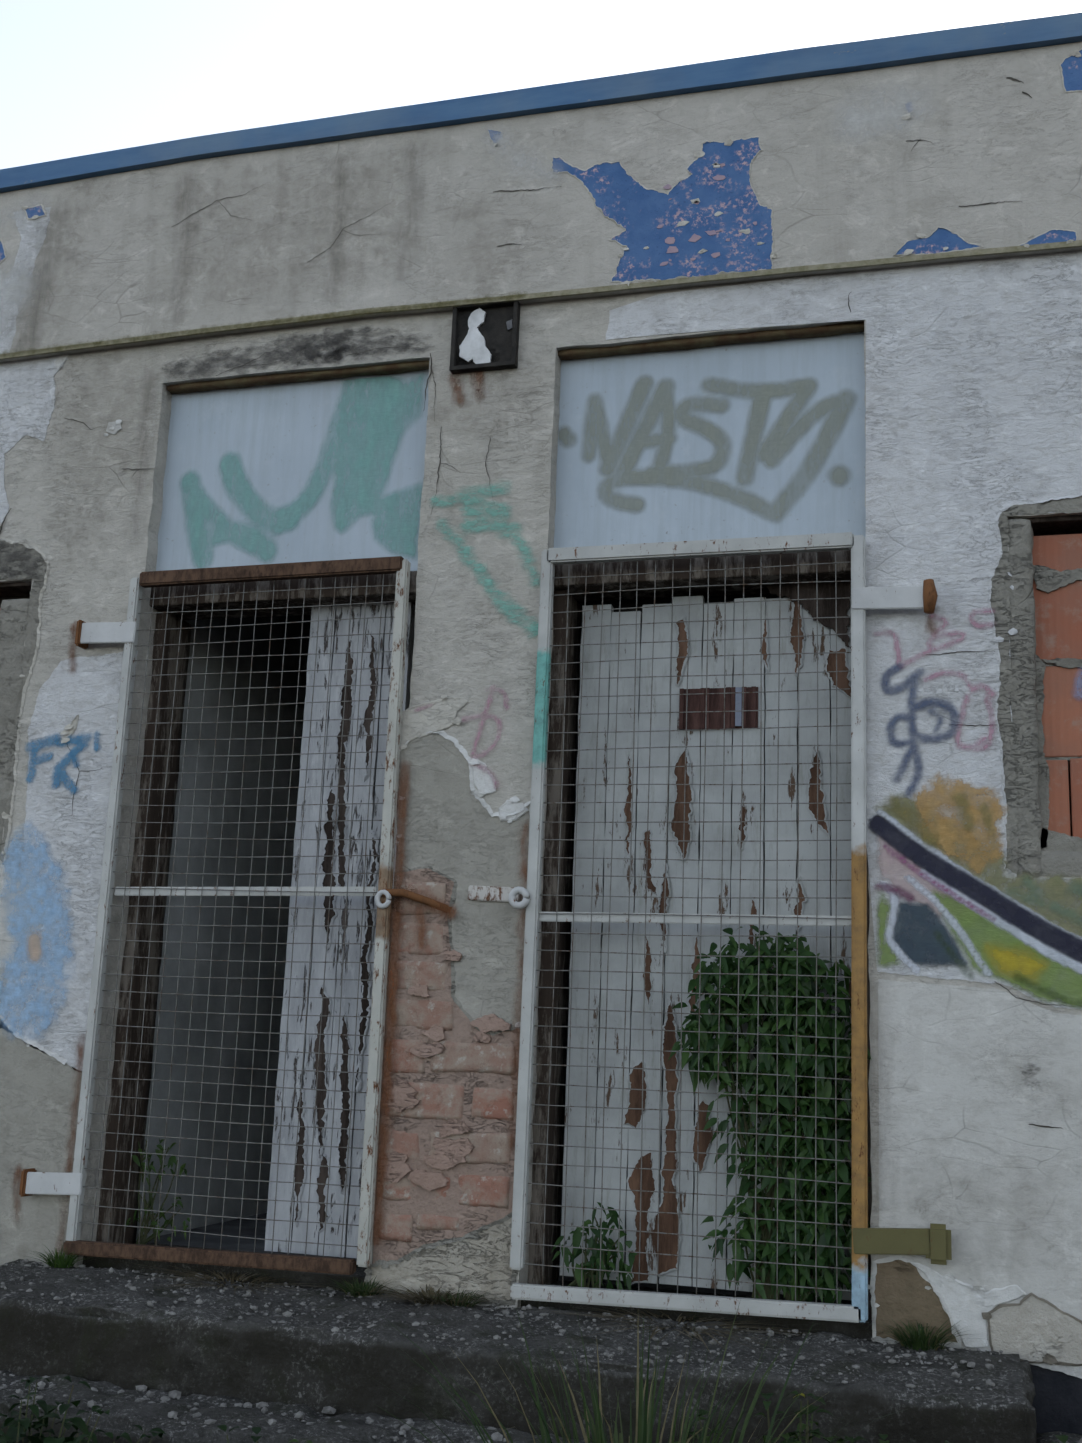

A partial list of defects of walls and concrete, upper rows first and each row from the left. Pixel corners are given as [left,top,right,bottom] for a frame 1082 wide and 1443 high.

peeling [1059,48,1082,93]
spalling [21,204,47,221]
crack [172,187,258,227]
crack [308,200,394,262]
peeling [551,136,777,286]
peeling [893,227,984,257]
peeling [1017,229,1078,248]
spalling [0,538,49,865]
spalling [987,493,1082,874]
peeling [321,635,376,945]
spalling [294,695,531,1306]
spalling [868,1255,1026,1348]